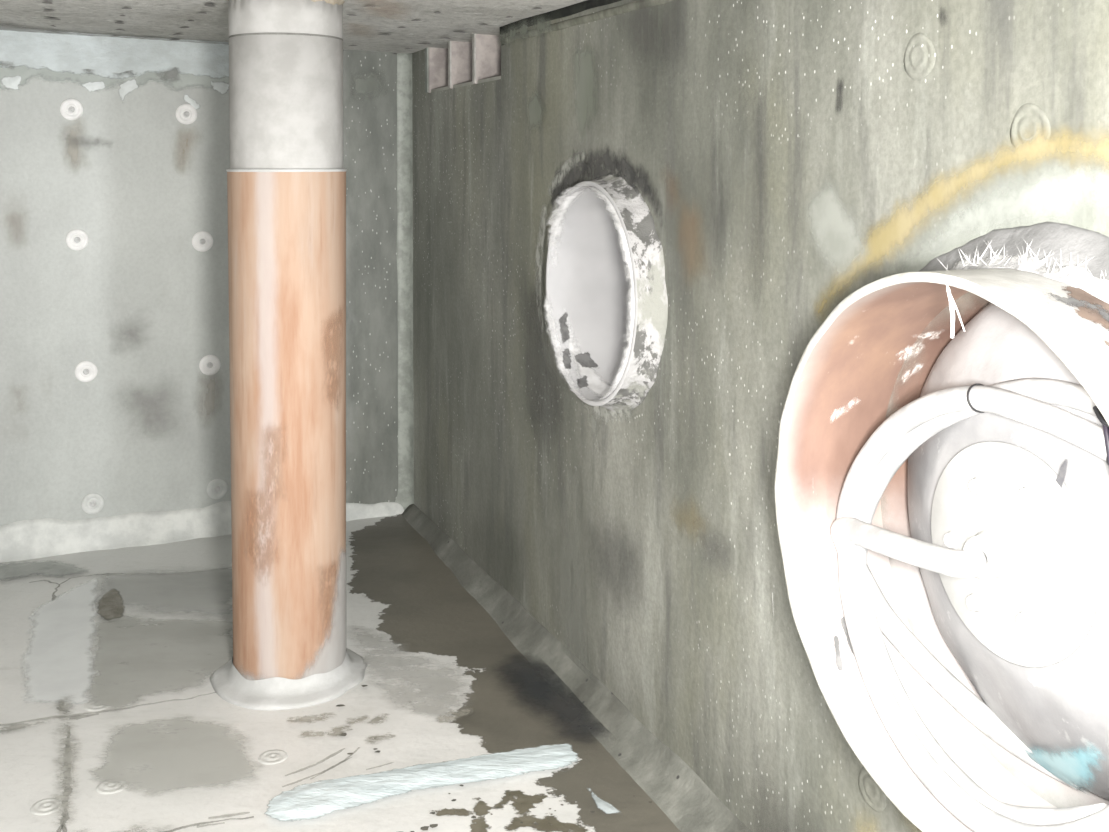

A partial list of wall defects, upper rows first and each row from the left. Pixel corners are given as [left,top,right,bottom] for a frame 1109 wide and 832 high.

peeling [0,2,229,109]
rust [818,133,1109,313]
peeling [559,312,598,388]
crack [29,567,232,601]
water stain [500,656,604,737]
crack [0,692,216,832]
crack [165,816,254,832]